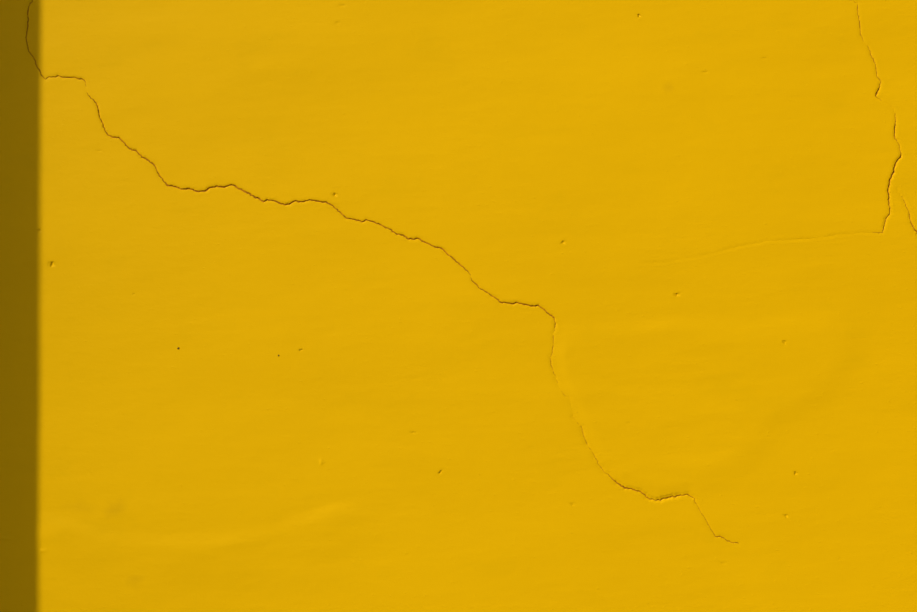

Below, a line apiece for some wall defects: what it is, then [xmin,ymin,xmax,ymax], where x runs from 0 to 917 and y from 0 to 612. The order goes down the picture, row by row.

crack [22,0,746,548]